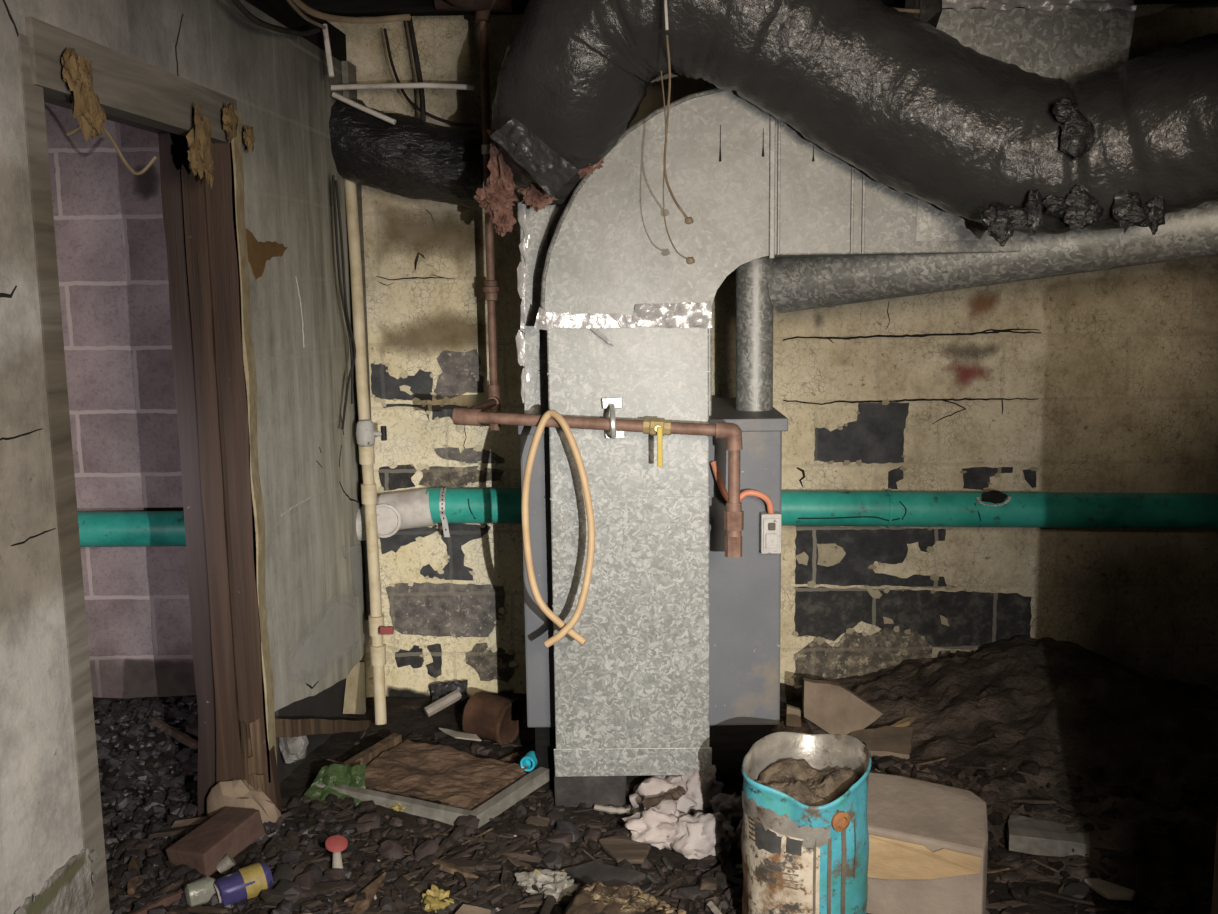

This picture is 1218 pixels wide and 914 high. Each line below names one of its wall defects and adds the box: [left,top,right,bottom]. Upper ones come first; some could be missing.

crack [3,0,19,37]
damp [386,216,483,254]
damp [388,317,486,350]
crack [783,303,1041,343]
peeling [370,349,488,430]
peeling [377,445,505,495]
peeling [814,399,909,491]
peeling [960,467,1040,507]
peeling [380,523,518,682]
peeling [792,526,1033,689]